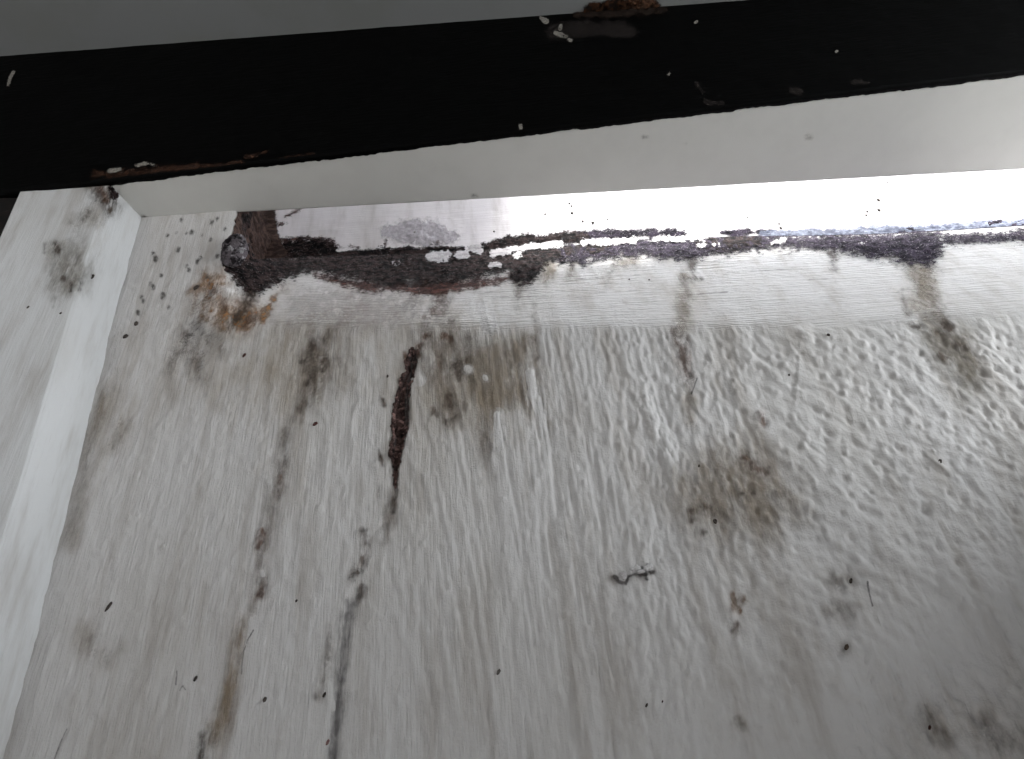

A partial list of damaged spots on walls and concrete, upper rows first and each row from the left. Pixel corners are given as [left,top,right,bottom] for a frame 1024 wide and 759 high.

peeling [382,219,459,246]
corrosion [190,273,277,331]
damp [335,677,343,736]